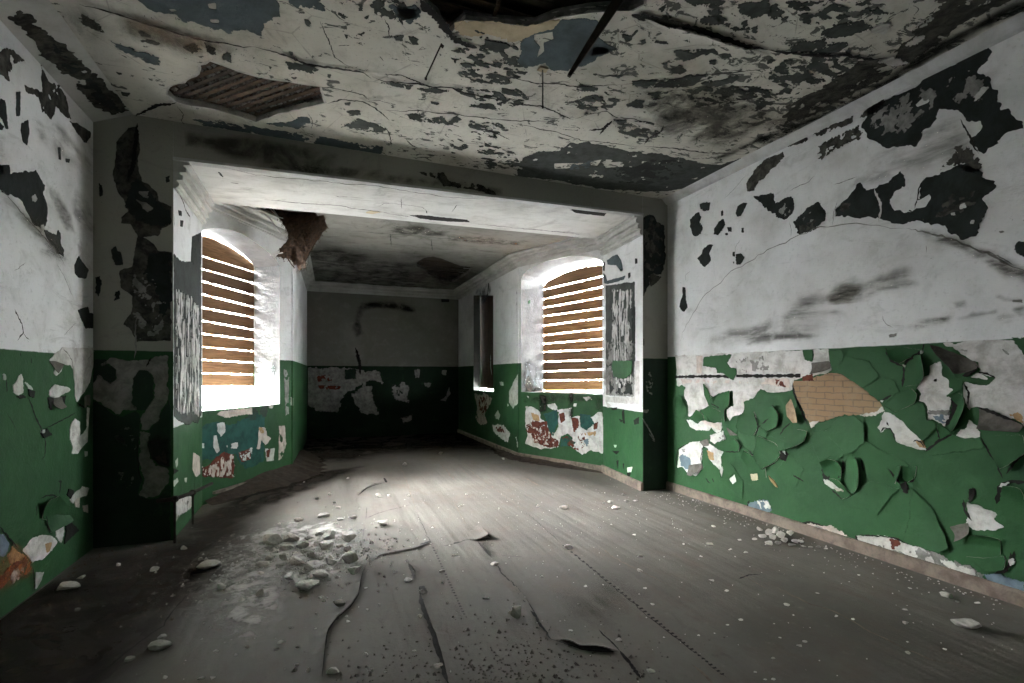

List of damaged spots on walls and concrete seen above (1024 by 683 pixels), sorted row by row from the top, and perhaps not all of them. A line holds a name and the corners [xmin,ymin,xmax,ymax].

peeling [0,165,64,257]
peeling [0,10,130,145]
peeling [338,0,421,45]
peeling [381,18,854,192]
peeling [685,0,891,34]
crack [685,177,1024,328]
peeling [690,48,1024,267]
flaking render [3,347,292,521]
flaking render [308,367,431,423]
flaking render [474,360,640,477]
peeling [669,337,1024,591]
flaking render [23,486,89,589]